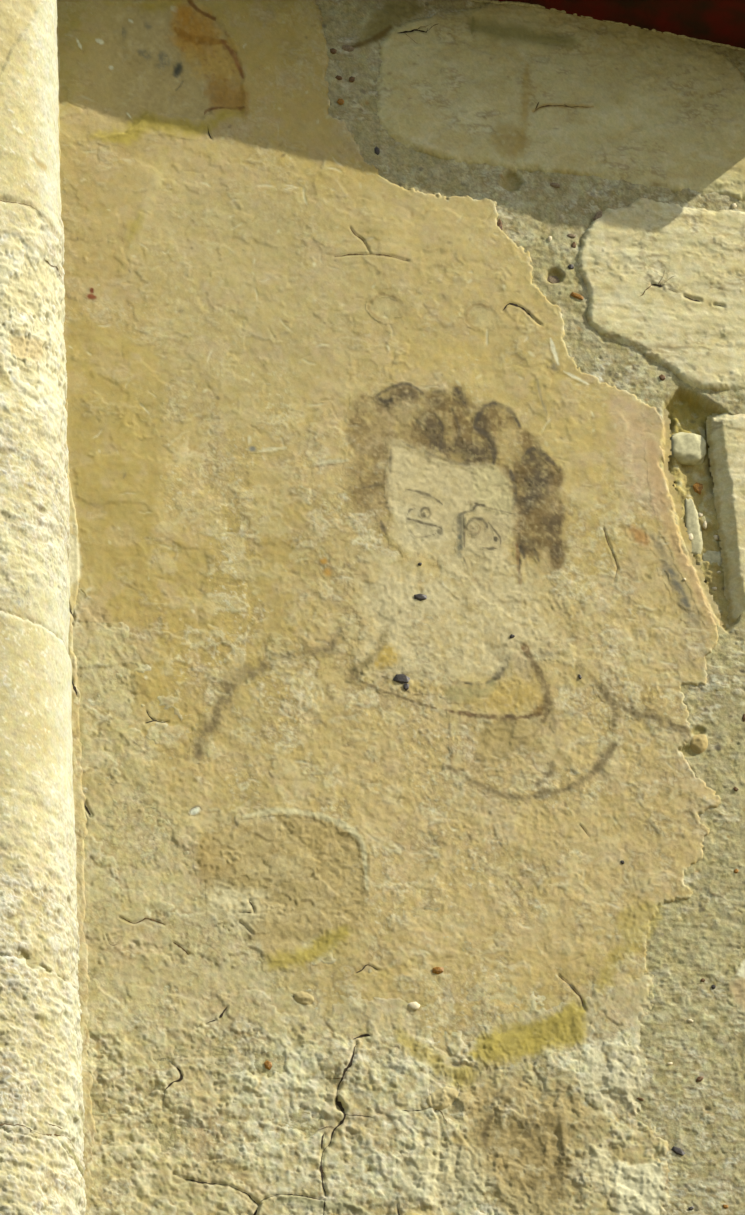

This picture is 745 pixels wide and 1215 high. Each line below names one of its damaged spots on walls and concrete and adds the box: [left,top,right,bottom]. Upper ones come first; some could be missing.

corrosion [162,0,253,124]
peeling [548,336,590,386]
peeling [393,674,410,691]
peeling [735,959,745,977]
crack [183,1034,373,1215]
spalling [395,1041,670,1215]